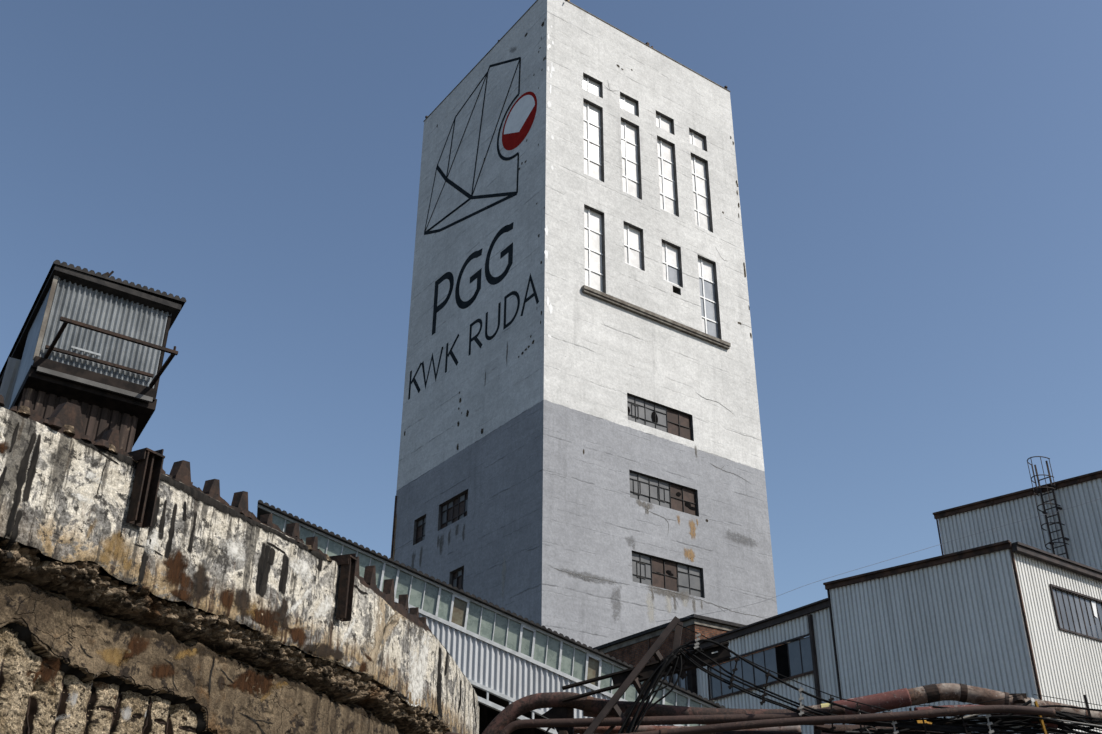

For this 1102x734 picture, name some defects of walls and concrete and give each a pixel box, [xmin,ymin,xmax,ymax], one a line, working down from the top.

water stain [77,438,137,468]
water stain [0,434,62,564]
rust [164,550,193,601]
water stain [139,474,327,630]
peeling [289,560,312,612]
rust [677,516,698,561]
spalling [0,621,215,734]
crack [0,617,234,734]
water stain [0,579,381,730]
crack [238,712,274,734]
crack [378,685,408,699]
peeling [408,630,431,707]